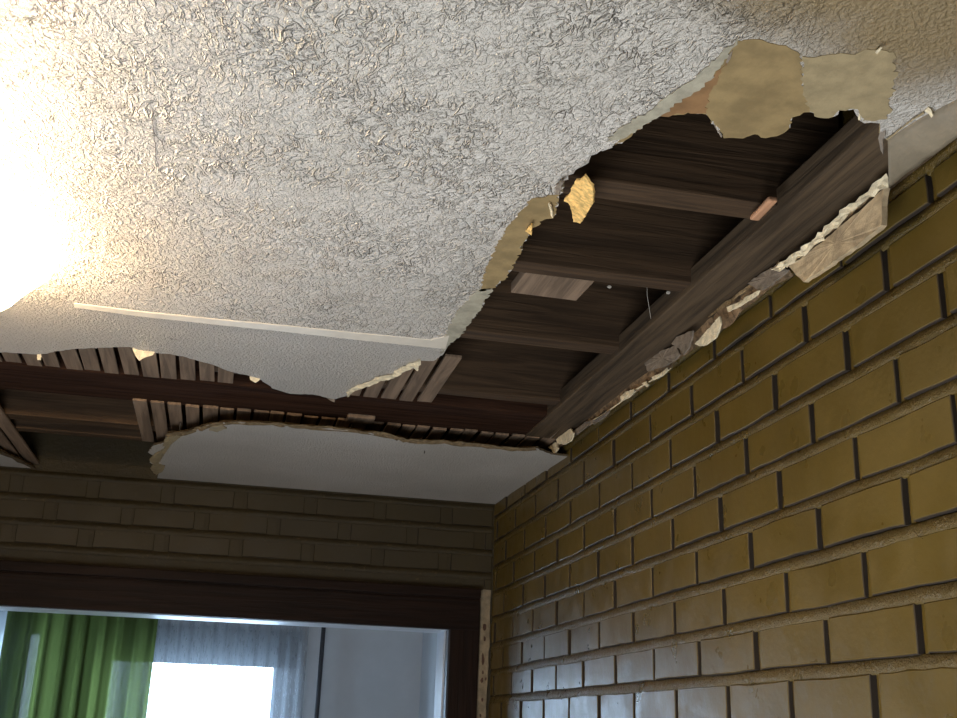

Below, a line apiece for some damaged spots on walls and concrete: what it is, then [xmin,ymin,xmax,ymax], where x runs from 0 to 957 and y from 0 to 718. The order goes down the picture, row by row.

flaking render [606,37,898,145]
flaking render [133,348,154,361]
flaking render [346,359,421,397]
flaking render [440,174,595,353]
peeling [548,173,890,453]
flaking render [149,421,536,475]